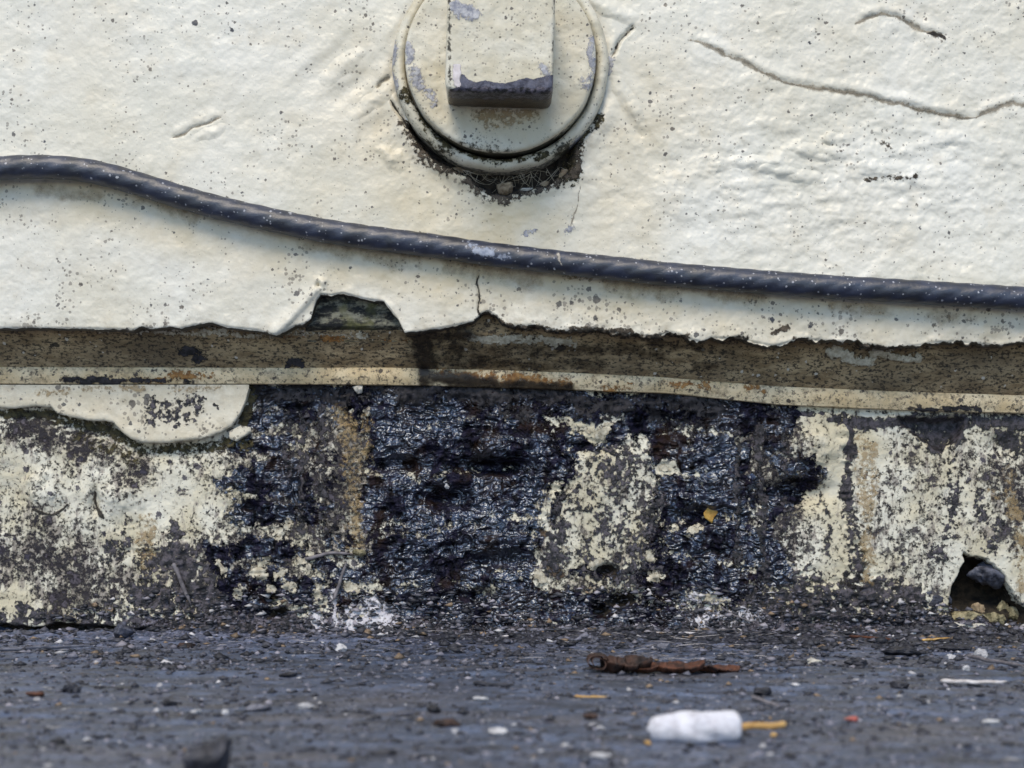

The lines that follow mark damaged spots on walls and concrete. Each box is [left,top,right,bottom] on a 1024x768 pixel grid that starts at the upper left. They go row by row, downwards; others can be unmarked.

crack [855,12,946,40]
crack [690,39,1024,120]
spalling [396,120,585,207]
spalling [272,276,411,342]
spalling [469,312,690,342]
spalling [771,324,809,342]
corrosion [434,368,573,386]
peeling [0,385,251,443]
leakage [202,326,870,633]
leakage [925,447,1006,570]
spalling [267,595,288,620]
spalling [926,554,1024,628]